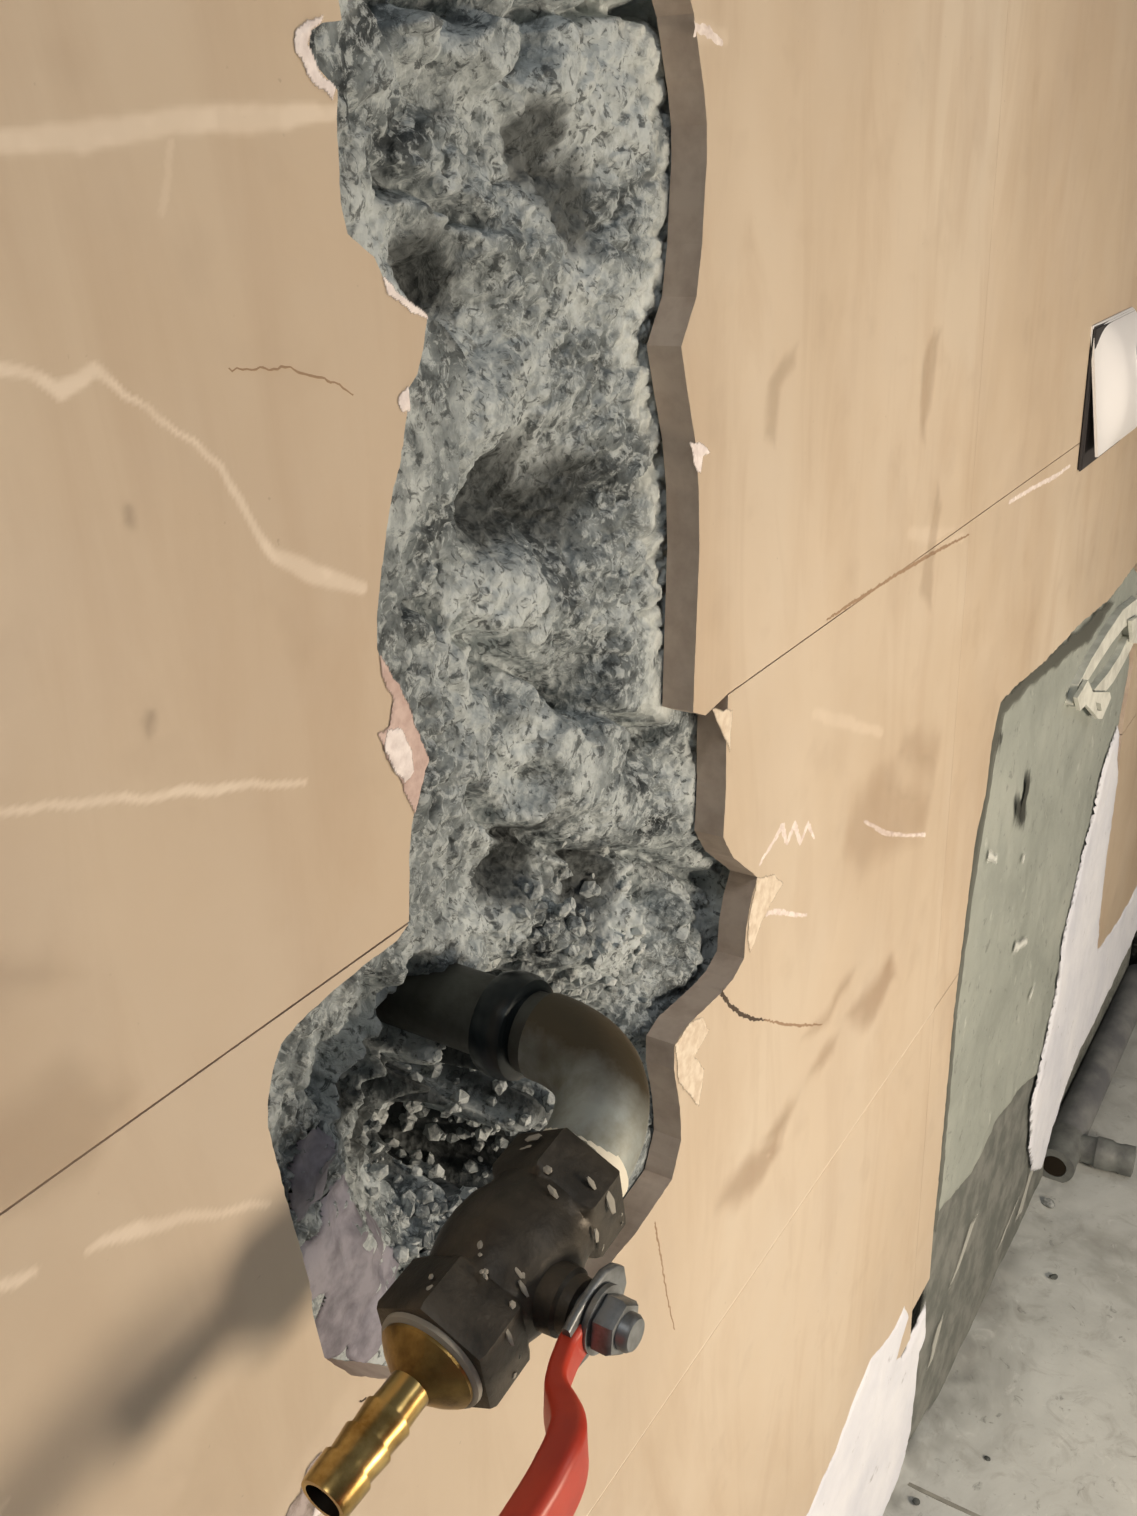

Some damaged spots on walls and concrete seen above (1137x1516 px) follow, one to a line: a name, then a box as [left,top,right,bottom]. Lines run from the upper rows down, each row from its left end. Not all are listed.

crack [228,365,354,396]
spalling [268,0,732,1366]
peeling [748,874,783,952]
crack [720,990,822,1028]
spalling [286,1452,322,1516]